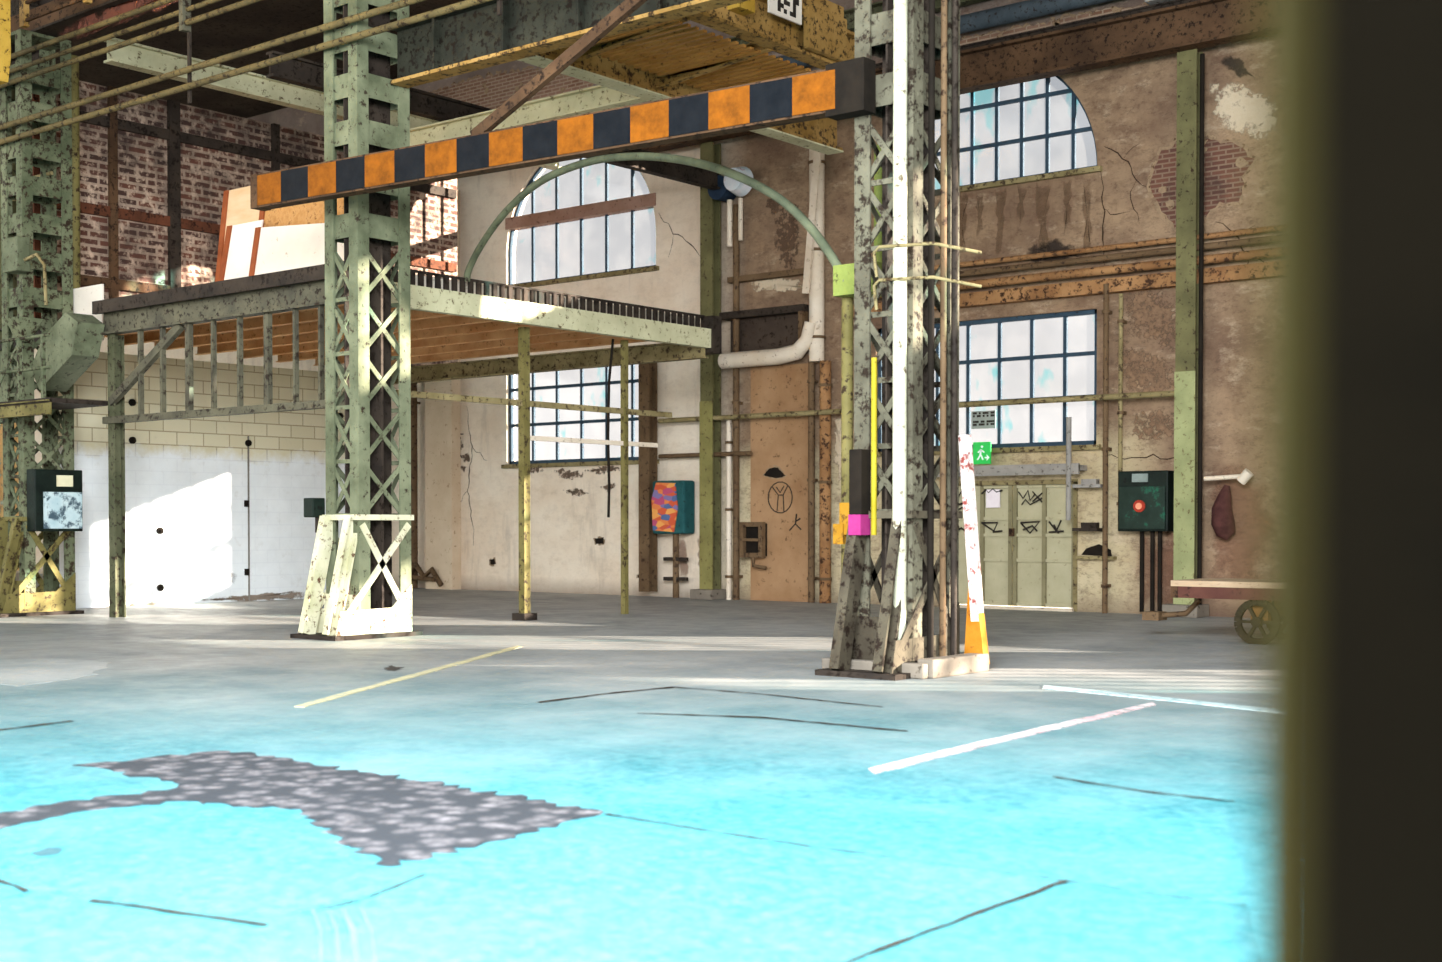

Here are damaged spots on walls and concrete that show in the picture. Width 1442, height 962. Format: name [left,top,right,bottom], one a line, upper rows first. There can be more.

flaking render [1146,138,1177,231]
flaking render [1204,131,1258,220]
water stain [1029,239,1079,262]